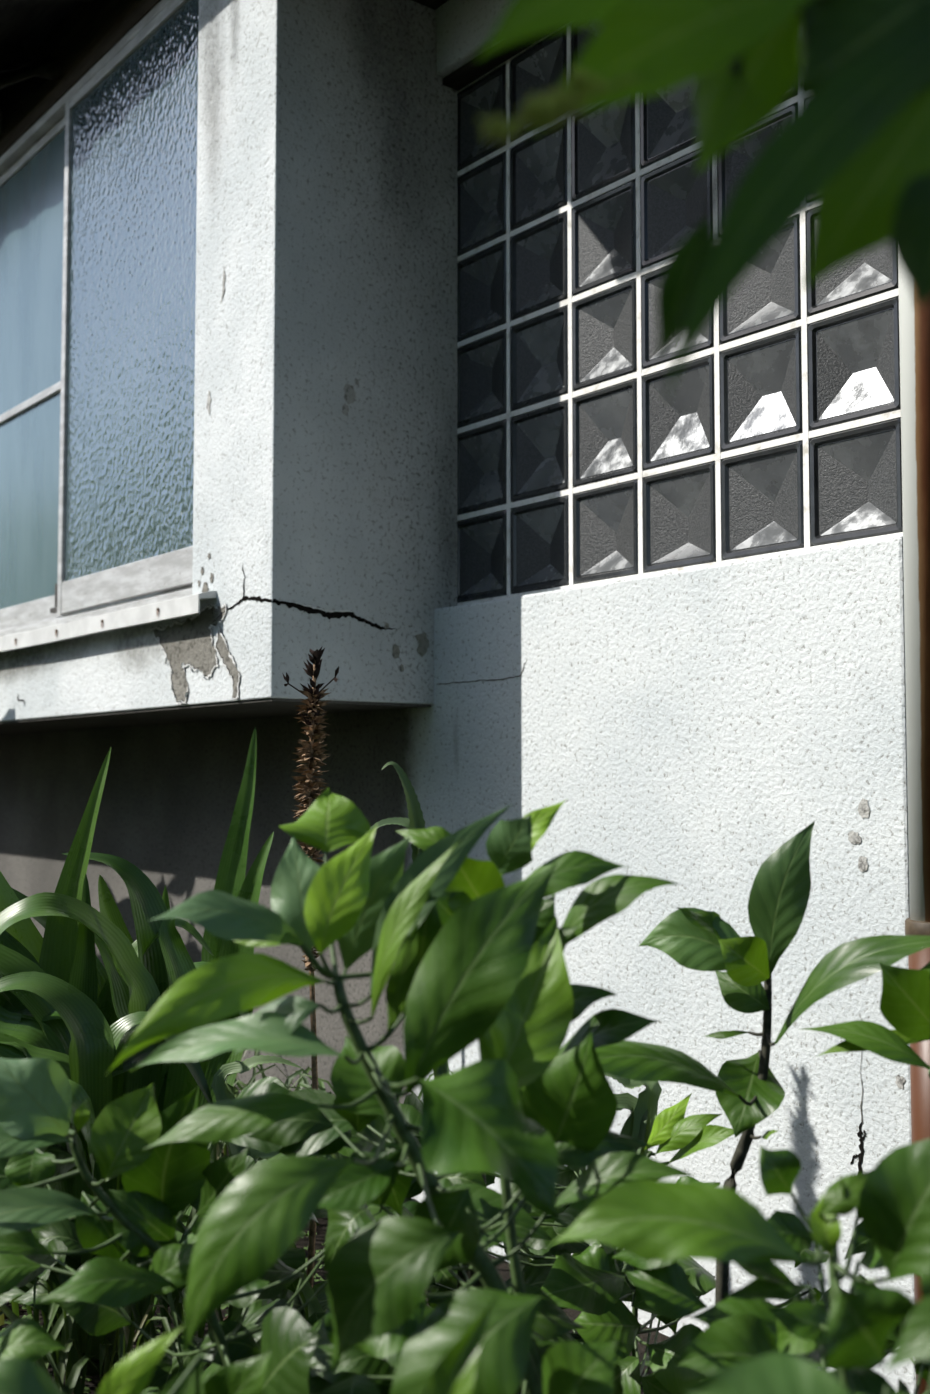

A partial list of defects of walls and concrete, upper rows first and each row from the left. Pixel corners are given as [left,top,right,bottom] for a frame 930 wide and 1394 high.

peeling [150,553,240,705]
crack [210,565,396,630]
crack [436,662,526,685]